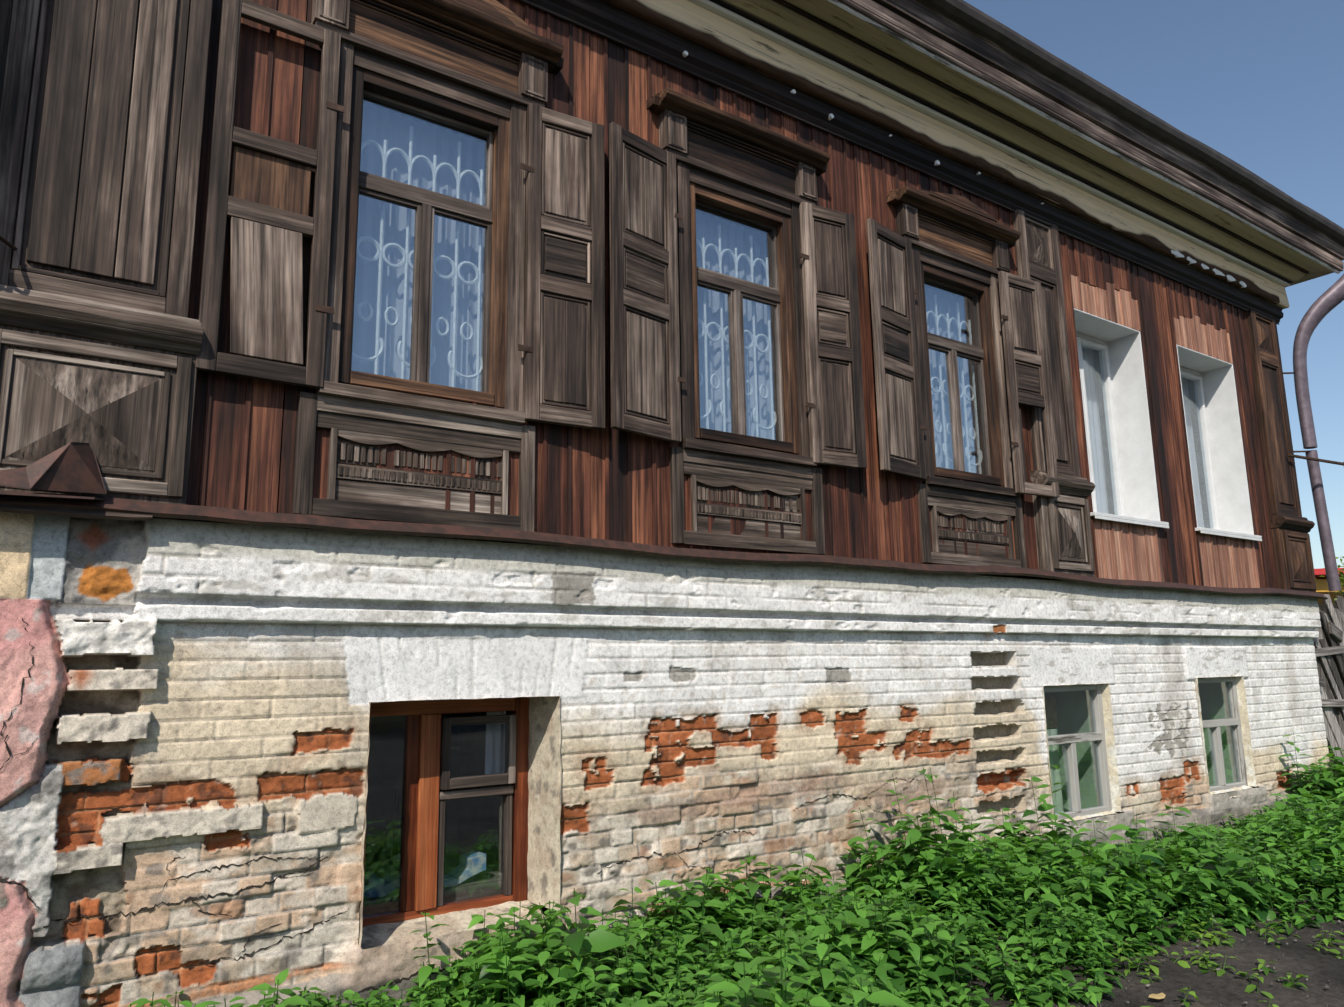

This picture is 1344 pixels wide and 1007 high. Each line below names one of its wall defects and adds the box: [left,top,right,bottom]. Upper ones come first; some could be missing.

crack [0,618,46,770]
spalling [0,517,365,943]
flaking render [560,756,615,834]
flaking render [641,713,780,786]
flaking render [800,705,972,764]
flaking render [976,766,1028,793]
flaking render [1126,783,1141,794]
peeling [1148,709,1201,804]
crack [0,855,349,967]
flaking render [81,983,123,1007]
flaking render [135,944,220,987]